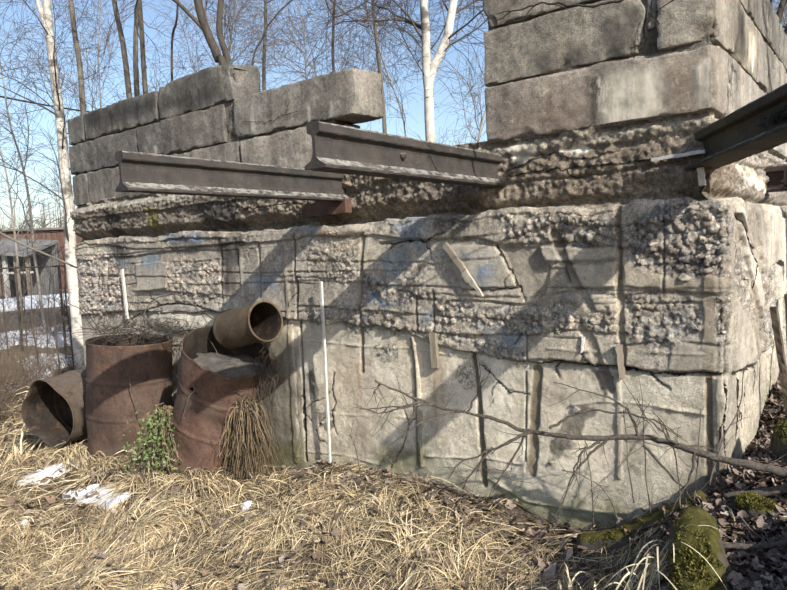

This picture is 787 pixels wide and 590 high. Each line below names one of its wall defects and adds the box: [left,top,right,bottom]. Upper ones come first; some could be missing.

crack [629,0,660,54]
crack [462,245,525,298]
spalling [301,235,704,369]
spalling [496,197,777,357]
spalling [455,364,477,390]
crack [534,351,766,469]